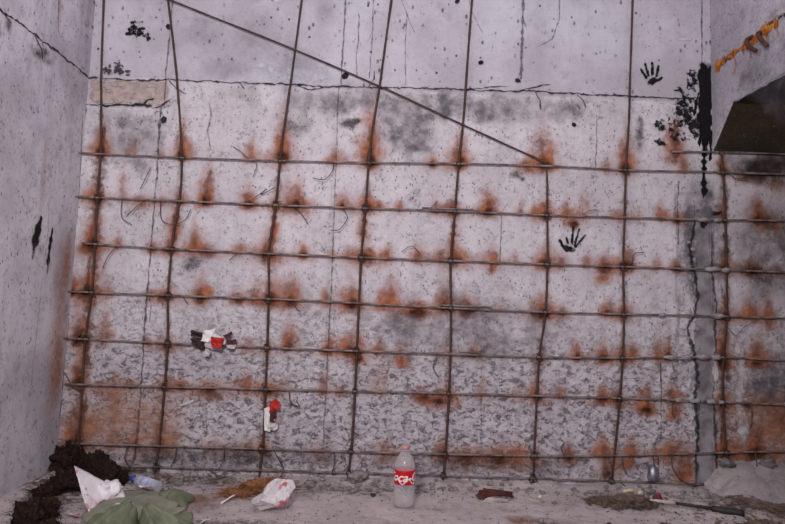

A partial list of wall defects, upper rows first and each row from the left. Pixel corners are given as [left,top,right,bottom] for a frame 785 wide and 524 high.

corrosion [714,18,779,74]
corrosion [360,119,380,170]
corrosion [518,141,554,172]
leakage [747,154,785,181]
corrosion [147,196,214,255]
corrosion [198,180,214,207]
corrosion [253,189,309,263]
crack [0,0,699,452]
corrosion [349,194,391,264]
corrosion [478,195,497,216]
corrosion [231,286,299,307]
corrosion [376,291,473,318]